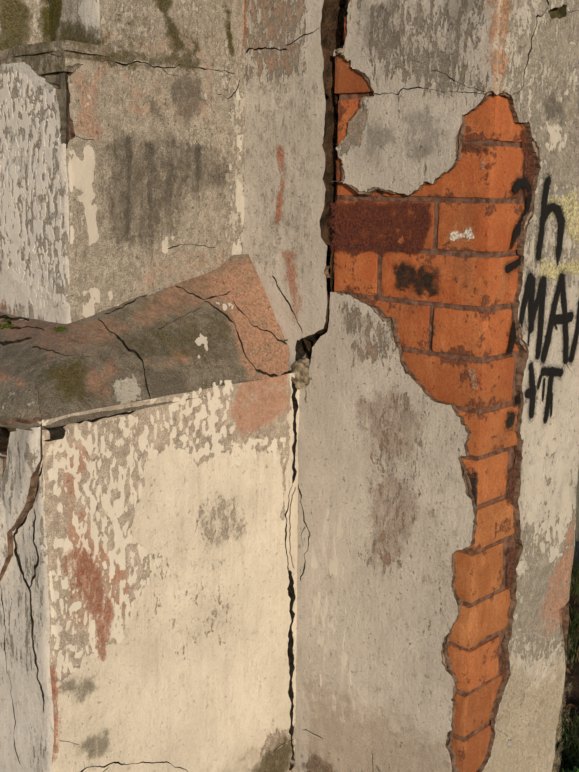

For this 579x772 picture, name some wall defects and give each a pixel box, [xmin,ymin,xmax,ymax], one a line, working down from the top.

damp [42,0,199,71]
peeling [0,55,99,310]
crack [0,315,74,356]
peeling [78,287,119,318]
crack [98,295,151,398]
crack [159,0,348,770]
flaking render [324,17,576,772]
crack [13,410,136,712]
peeling [46,380,286,680]
crack [80,761,188,772]
damp [254,738,293,772]
damp [303,755,332,772]